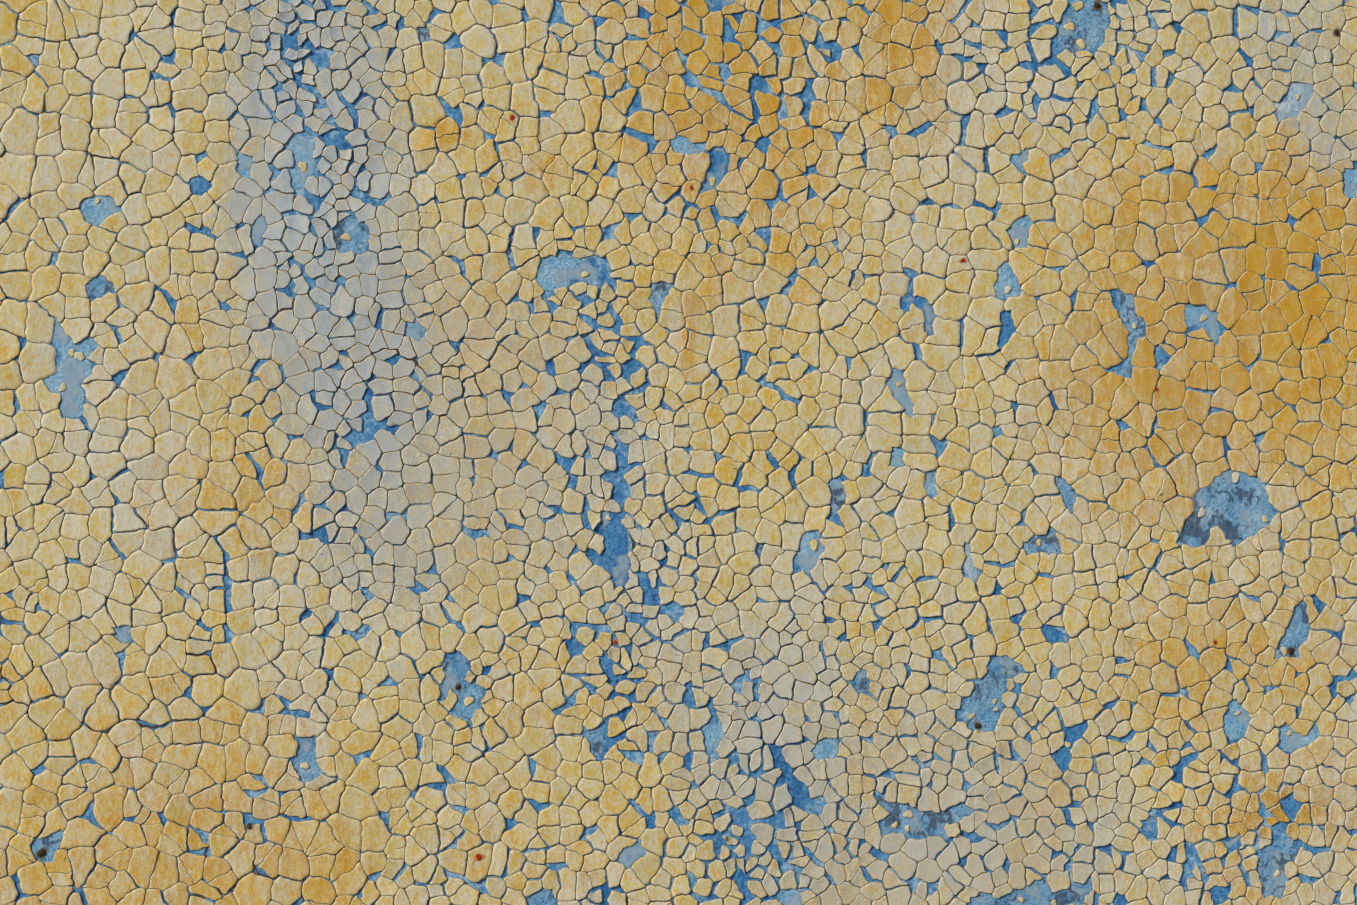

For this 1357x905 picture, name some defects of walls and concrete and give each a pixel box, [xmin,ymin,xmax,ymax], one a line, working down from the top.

peeling [1030,0,1111,64]
crack [78,71,124,184]
peeling [535,253,600,300]
peeling [18,317,99,419]
crack [388,345,468,410]
crack [1148,434,1190,498]
peeling [1165,453,1275,547]
crack [112,513,243,604]
crack [1,626,249,758]
peeling [958,655,1023,732]
crack [171,821,319,905]
peeling [745,822,802,905]